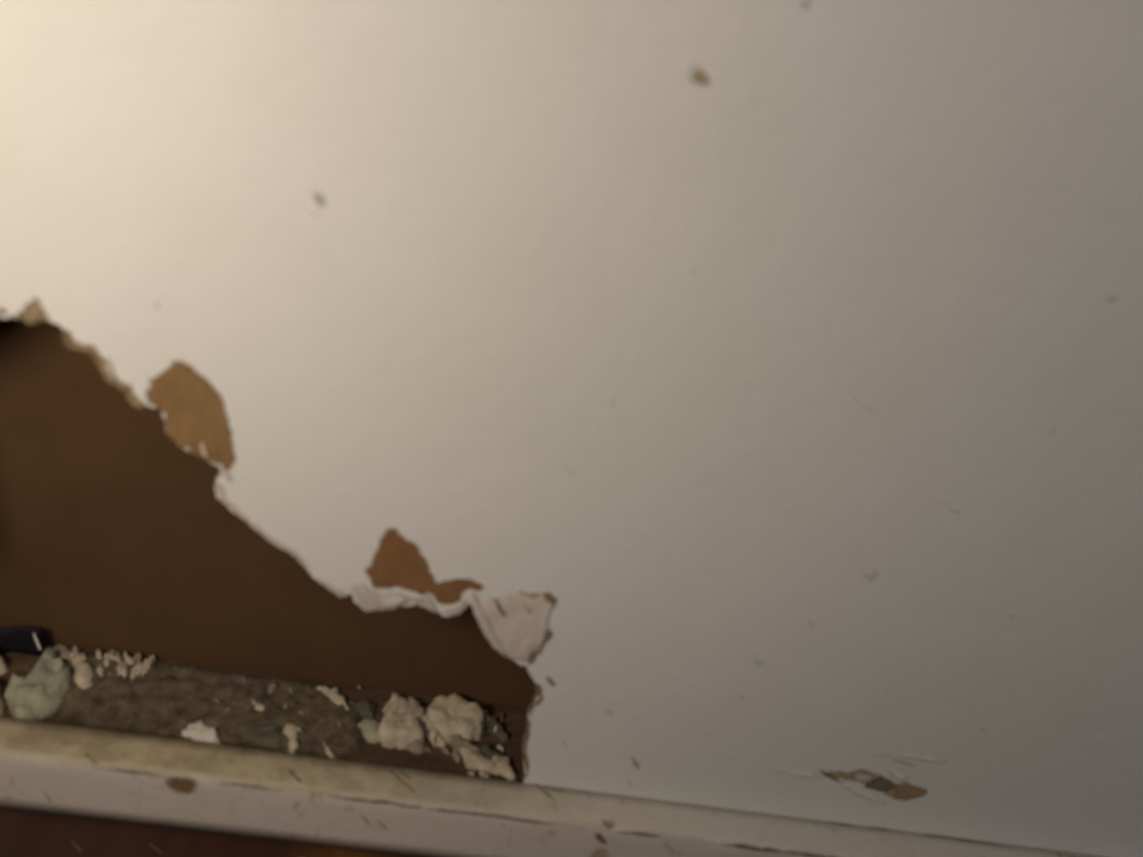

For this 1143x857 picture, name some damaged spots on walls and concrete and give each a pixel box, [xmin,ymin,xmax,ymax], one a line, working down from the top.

peeling [146,361,235,470]
spalling [365,529,555,665]
peeling [166,778,195,793]
spalling [778,769,927,804]